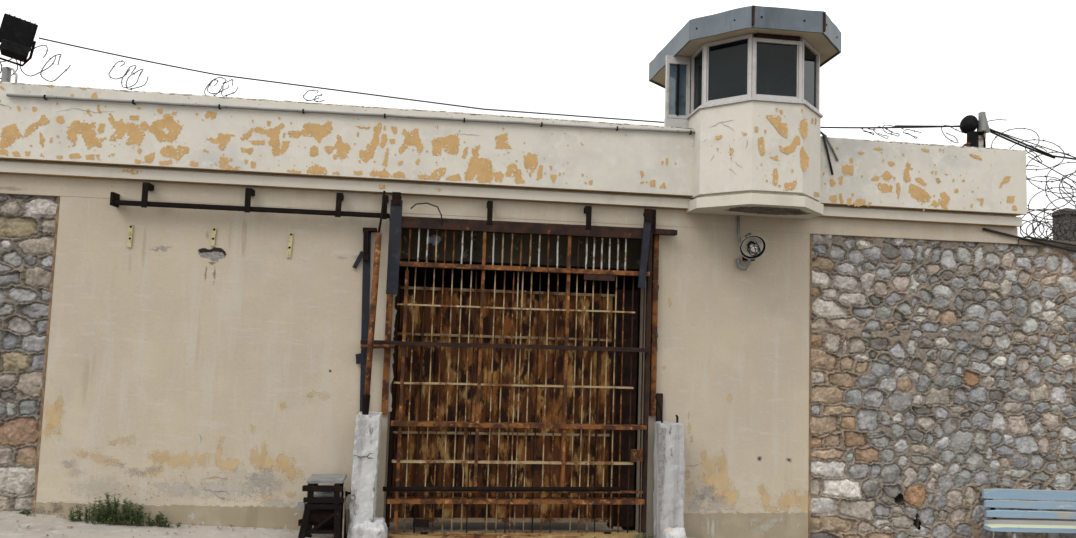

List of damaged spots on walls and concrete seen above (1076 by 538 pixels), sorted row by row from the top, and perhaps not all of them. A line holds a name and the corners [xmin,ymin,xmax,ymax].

peeling [0,83,565,191]
peeling [742,108,817,190]
peeling [814,147,984,211]
peeling [1000,176,1017,211]
flaking render [198,247,226,265]
water stain [147,424,303,505]
water stain [695,450,744,537]